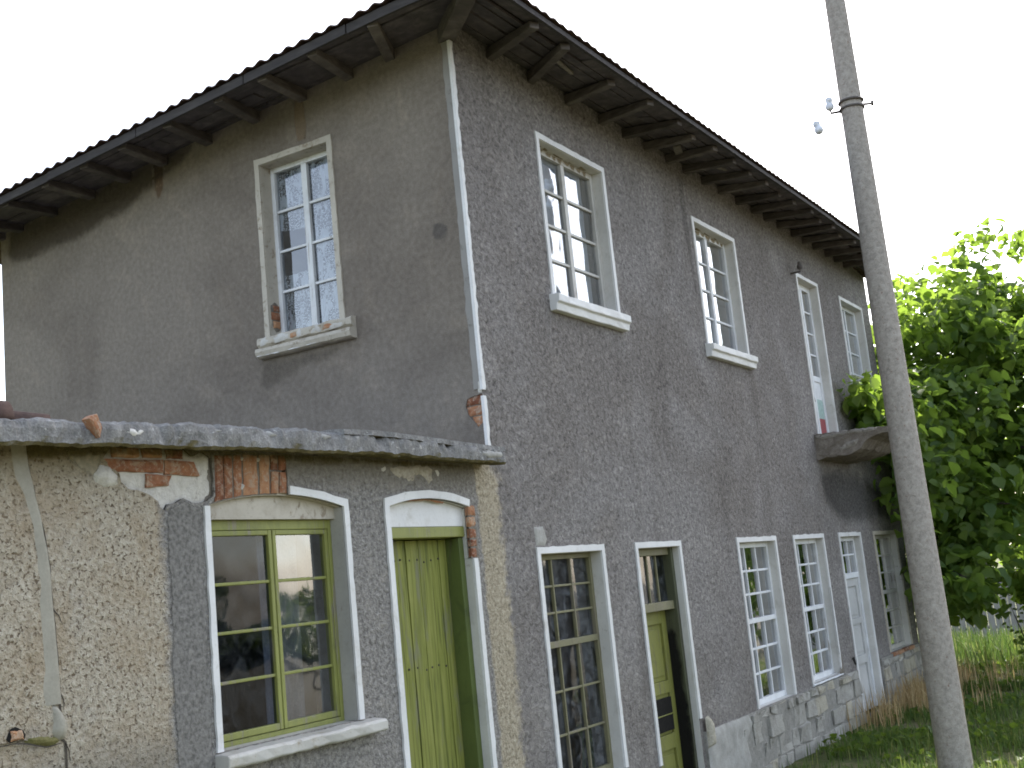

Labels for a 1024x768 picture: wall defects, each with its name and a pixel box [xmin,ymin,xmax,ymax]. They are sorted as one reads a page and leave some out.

flaking render [467,381,483,427]
spalling [103,429,209,509]